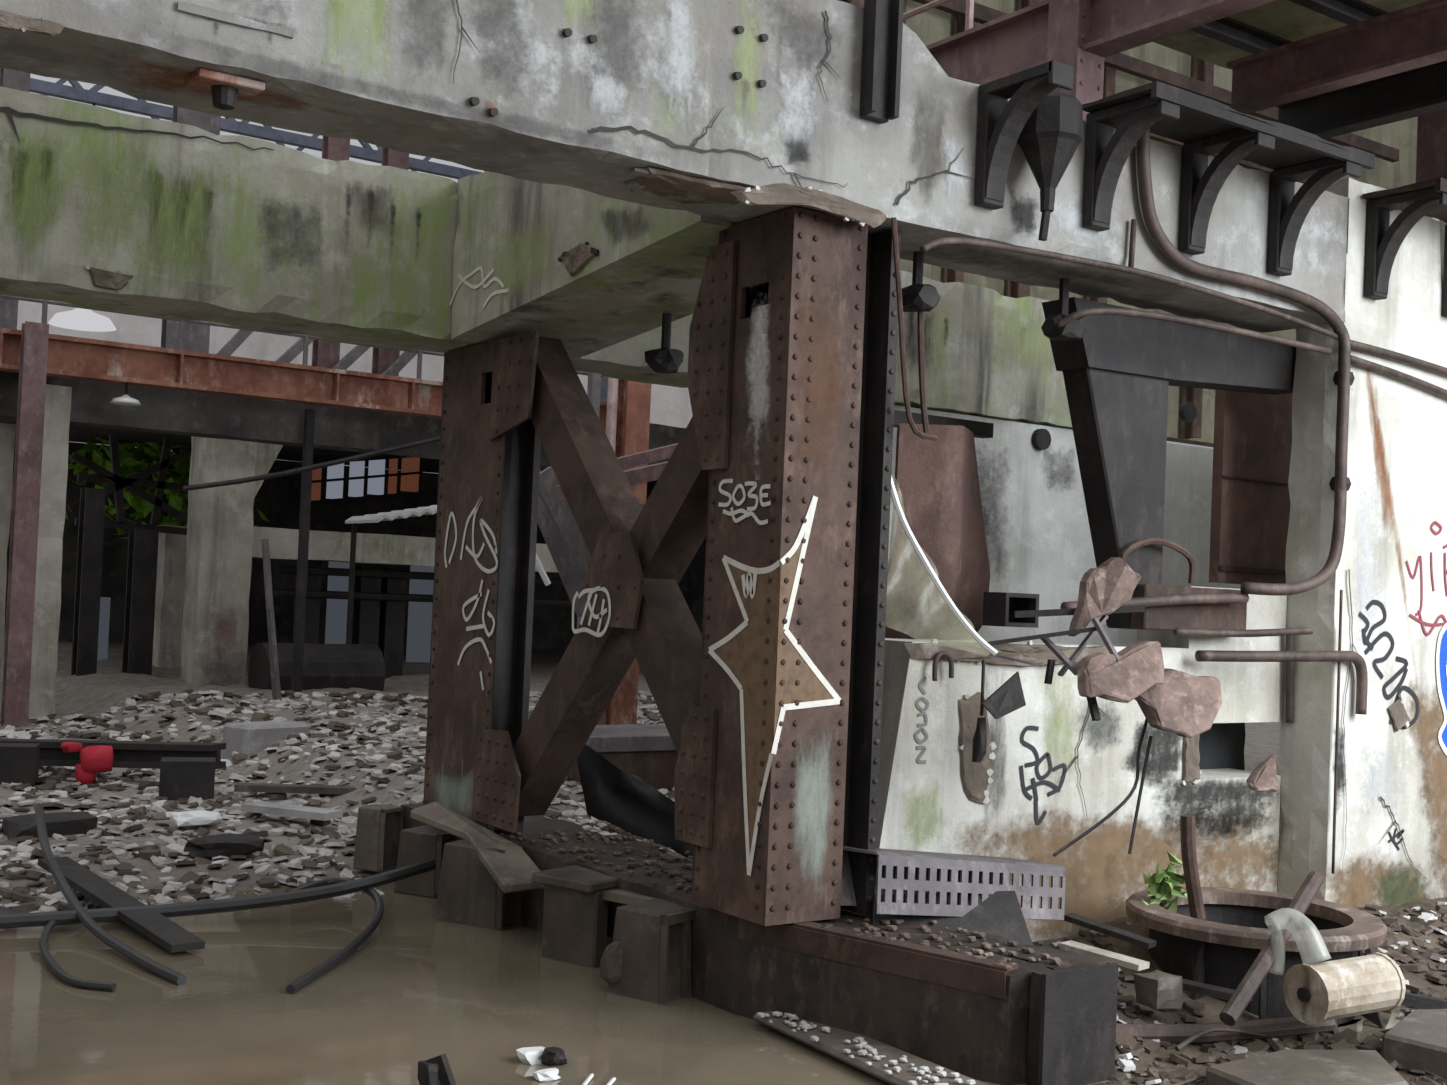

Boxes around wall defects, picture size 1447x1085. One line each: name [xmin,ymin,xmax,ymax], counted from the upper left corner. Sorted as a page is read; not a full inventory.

crack [453,0,480,81]
water stain [347,188,395,224]
crack [591,107,848,188]
crack [895,148,974,205]
water stain [747,305,769,424]
corrosion [1370,391,1393,517]
water stain [1382,869,1426,907]